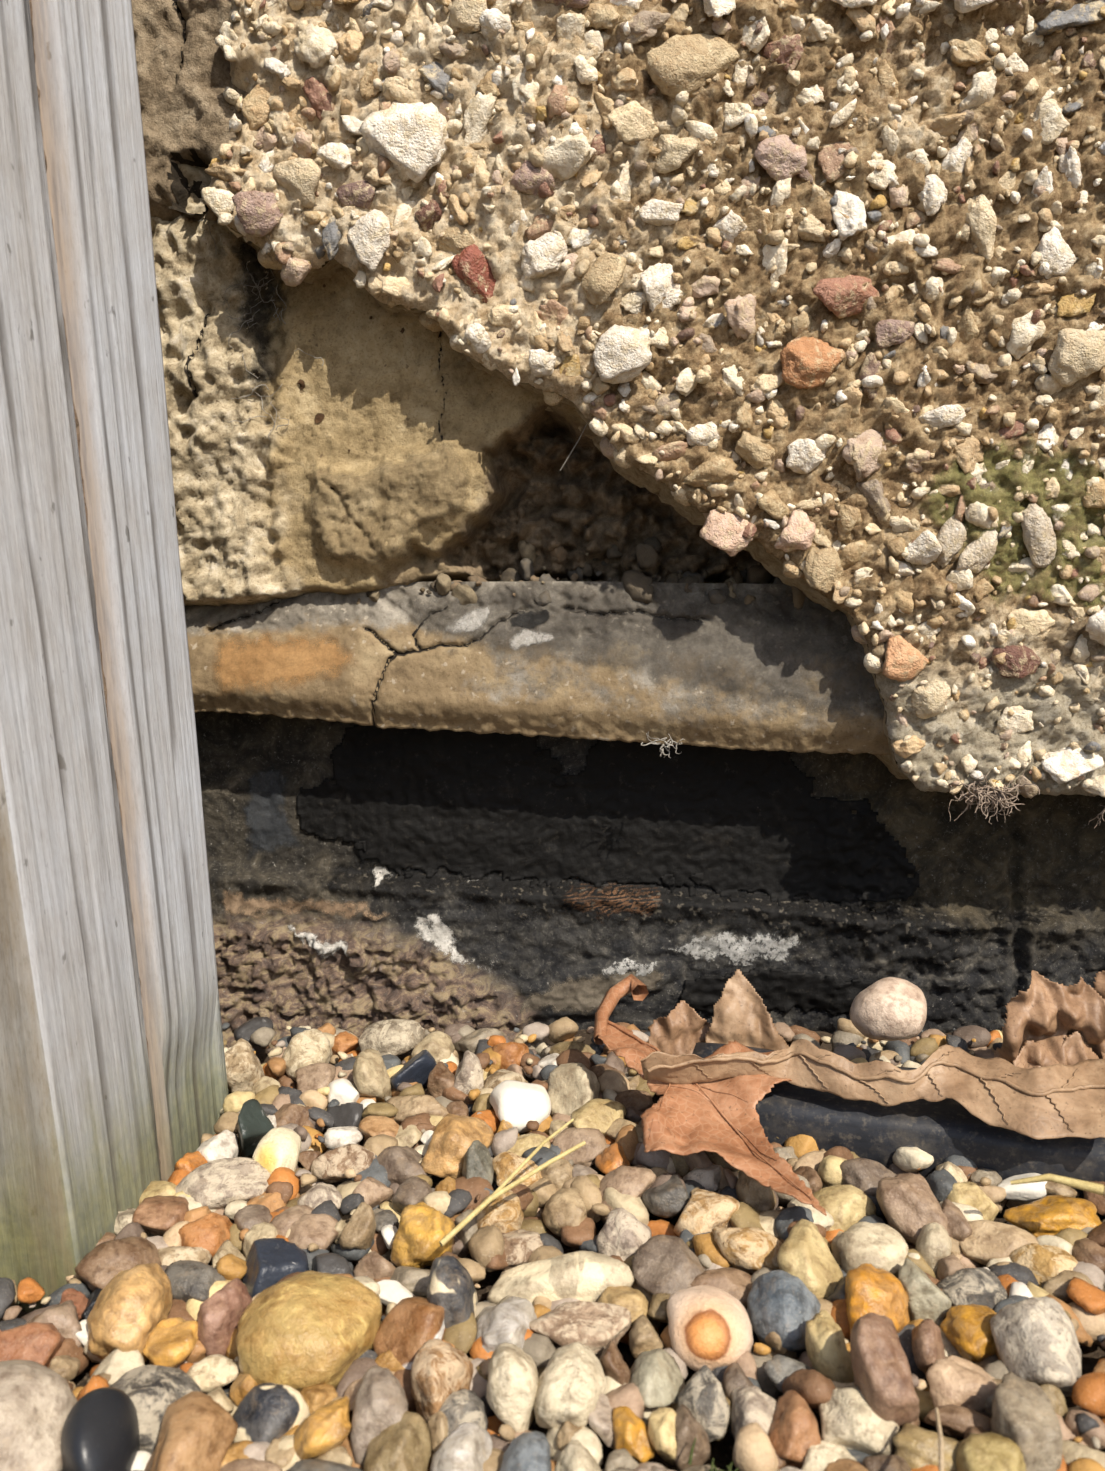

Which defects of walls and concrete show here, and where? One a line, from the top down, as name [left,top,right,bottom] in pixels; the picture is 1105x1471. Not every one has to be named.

crack [172,0,186,78]
spalling [215,21,238,51]
spalling [223,87,240,106]
spalling [151,164,918,789]
crack [364,607,526,726]
efflorescence [374,867,389,886]
efflorescence [288,925,347,958]
efflorescence [414,914,468,962]
damp [672,931,798,966]
damp [520,958,664,1013]